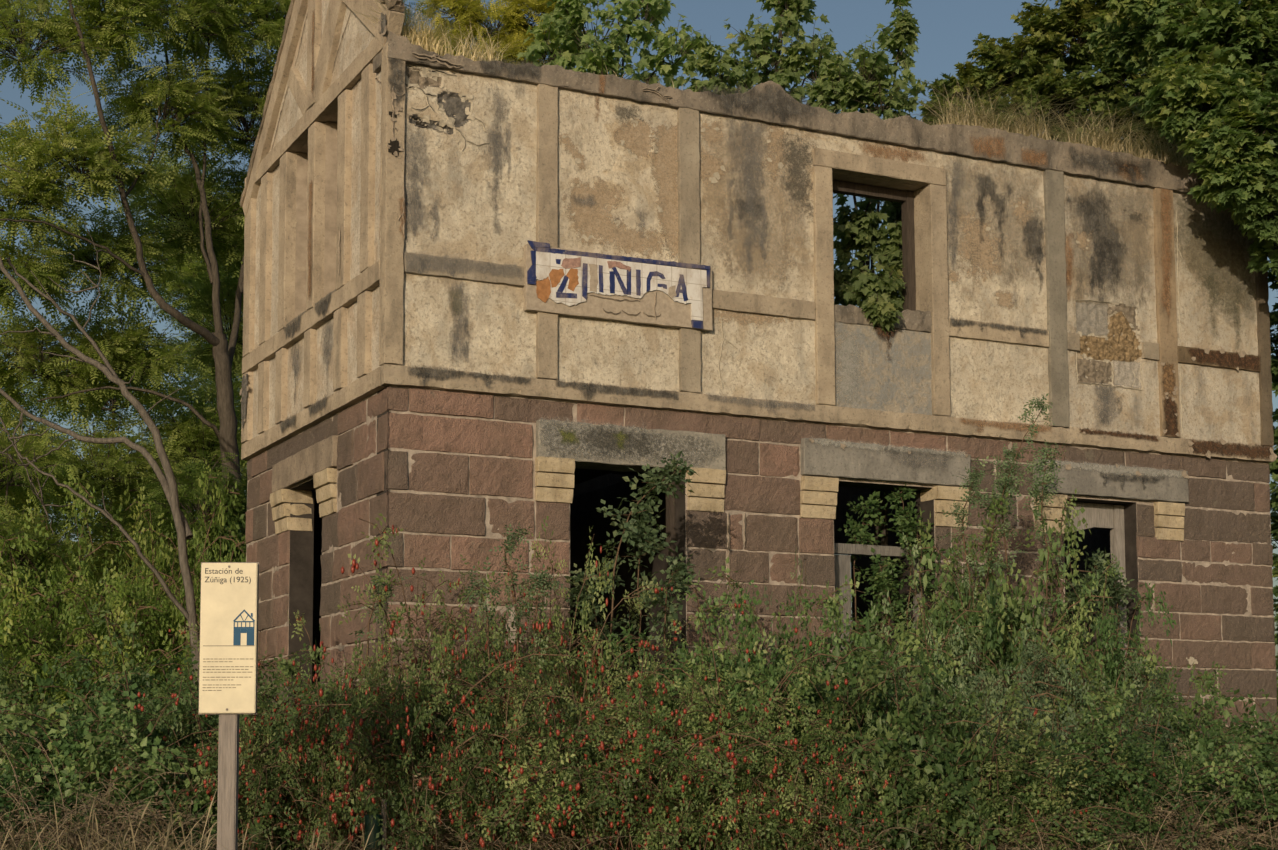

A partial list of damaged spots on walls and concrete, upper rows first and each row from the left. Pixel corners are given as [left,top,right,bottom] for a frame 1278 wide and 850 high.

crack [332,11,489,151]
spalling [378,13,475,135]
water stain [404,129,438,235]
water stain [489,95,511,189]
water stain [977,176,1012,257]
water stain [1023,219,1044,283]
water stain [1067,192,1123,301]
rust [1161,189,1172,317]
water stain [406,254,531,387]
spalling [1076,303,1142,387]